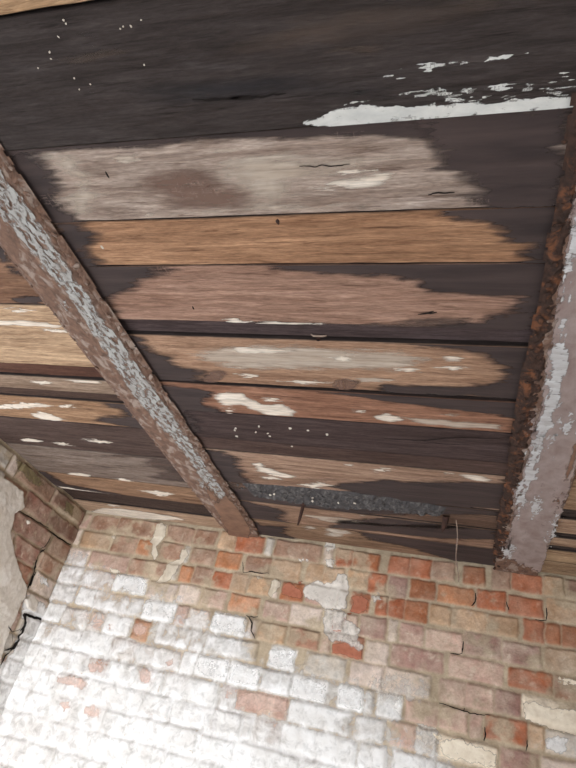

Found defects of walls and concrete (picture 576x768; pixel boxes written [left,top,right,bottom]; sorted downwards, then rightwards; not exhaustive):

peeling [416,61,468,72]
crack [192,93,286,101]
peeling [303,72,576,127]
peeling [0,170,225,499]
corrosion [492,92,576,570]
peeling [501,198,576,573]
crack [1,613,42,665]
peeling [0,475,452,768]
crack [440,703,488,740]
peeling [546,736,568,754]